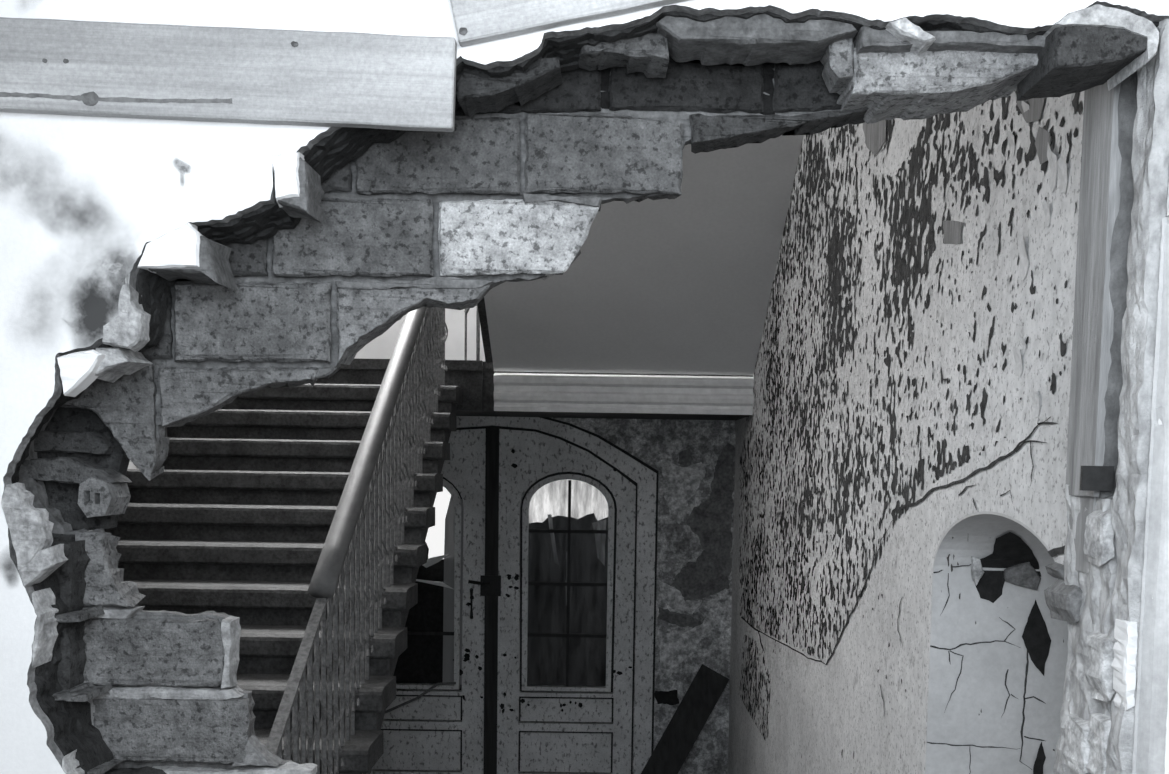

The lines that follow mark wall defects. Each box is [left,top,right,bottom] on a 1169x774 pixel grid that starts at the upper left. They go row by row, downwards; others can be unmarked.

flaking render [271,4,1159,681]
flaking render [1,223,491,774]
crack [741,417,1058,665]
peeling [1033,185,1169,774]
flaking render [655,690,679,705]
peeling [739,634,779,745]
crack [897,598,1046,774]